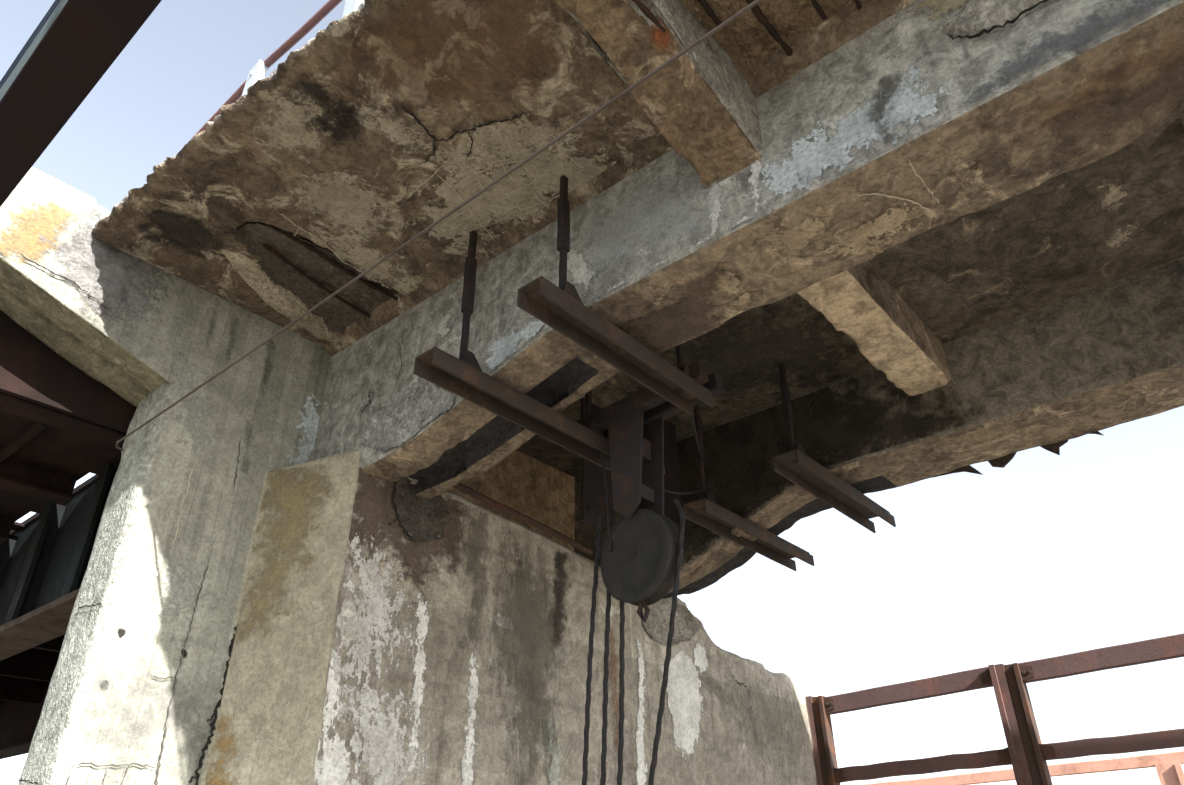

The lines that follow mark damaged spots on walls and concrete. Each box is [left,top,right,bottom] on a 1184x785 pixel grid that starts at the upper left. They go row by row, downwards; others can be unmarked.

spalling [683,0,862,76]
flaking render [907,0,1043,39]
crack [942,0,1049,40]
leakage [254,75,617,296]
spalling [221,222,402,340]
crack [172,464,194,545]
crack [66,536,217,785]
crack [188,610,241,785]
leakage [314,467,569,785]
leakage [636,639,648,785]
spalling [642,603,701,646]
leakage [659,642,709,759]